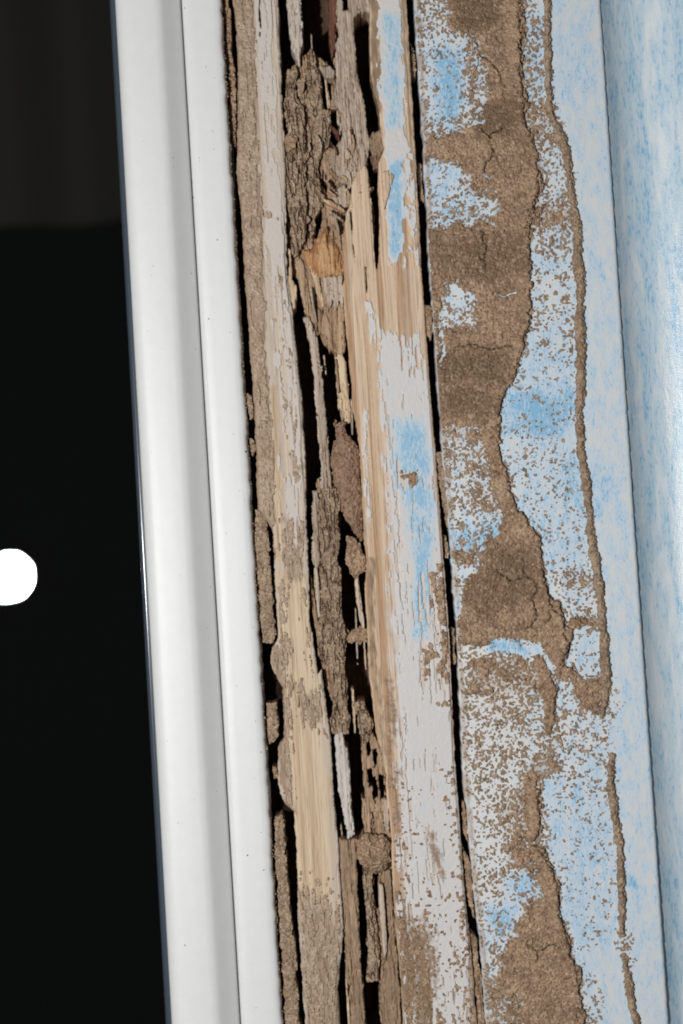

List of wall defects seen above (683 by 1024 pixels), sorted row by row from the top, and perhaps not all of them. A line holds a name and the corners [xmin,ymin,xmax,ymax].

peeling [253,0,331,548]
peeling [376,0,419,269]
spalling [317,486,374,744]
peeling [361,301,470,1024]